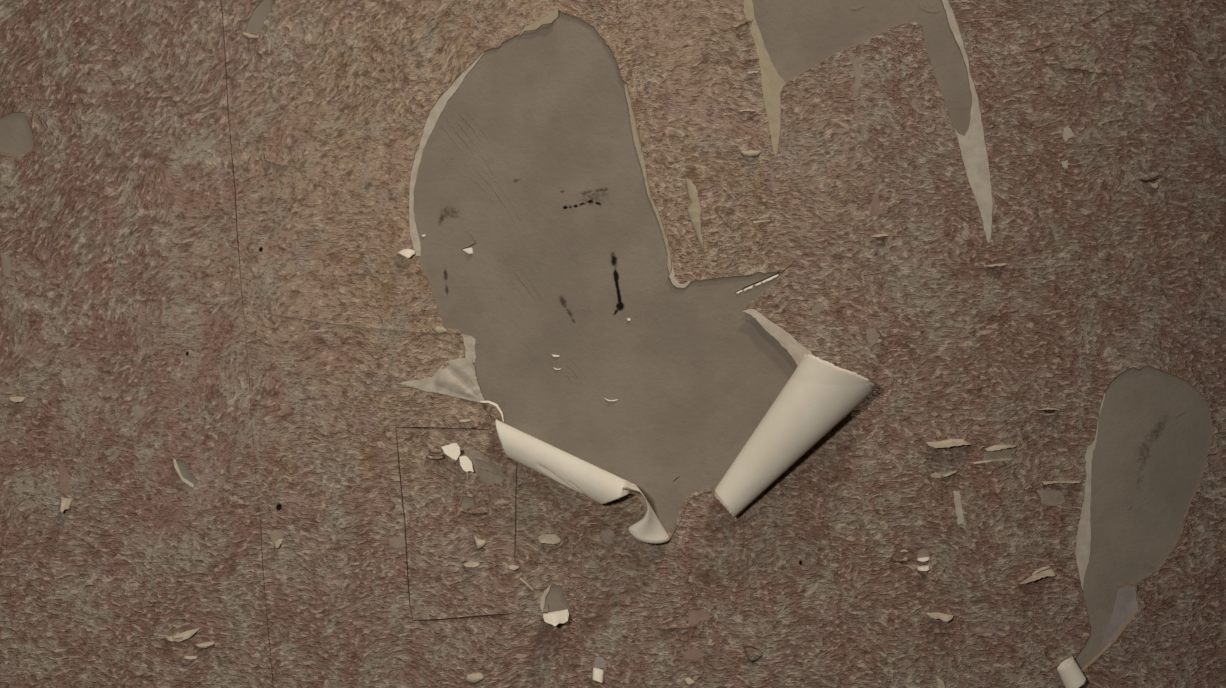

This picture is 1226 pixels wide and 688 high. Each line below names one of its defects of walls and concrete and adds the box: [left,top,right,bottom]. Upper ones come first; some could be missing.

peeling [0,113,34,158]
peeling [731,0,993,242]
peeling [396,9,876,543]
peeling [538,534,563,550]